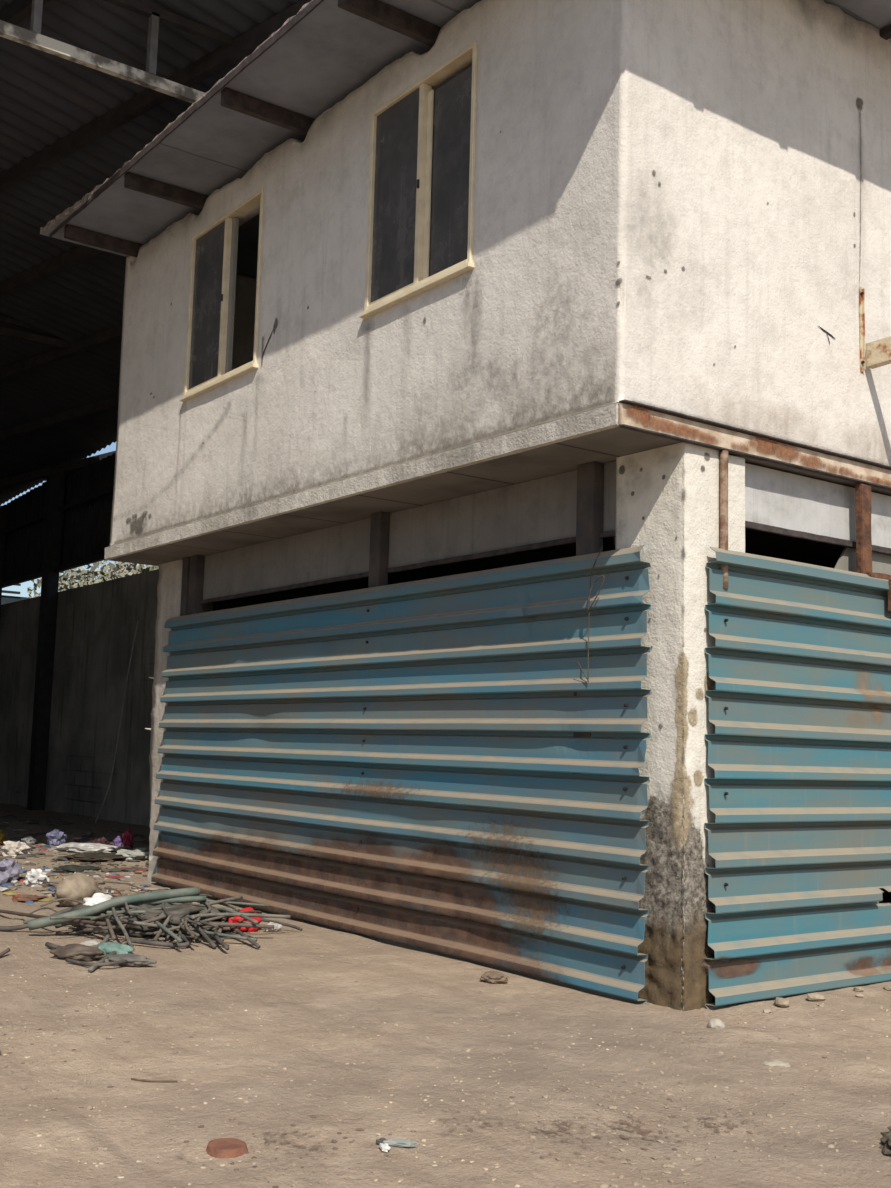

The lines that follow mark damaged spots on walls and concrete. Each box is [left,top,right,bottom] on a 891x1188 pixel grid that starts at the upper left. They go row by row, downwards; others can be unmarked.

corrosion [627,405,718,443]
corrosion [732,437,891,486]
corrosion [342,780,409,800]
corrosion [152,822,569,981]
corrosion [703,957,759,978]
corrosion [847,957,891,976]